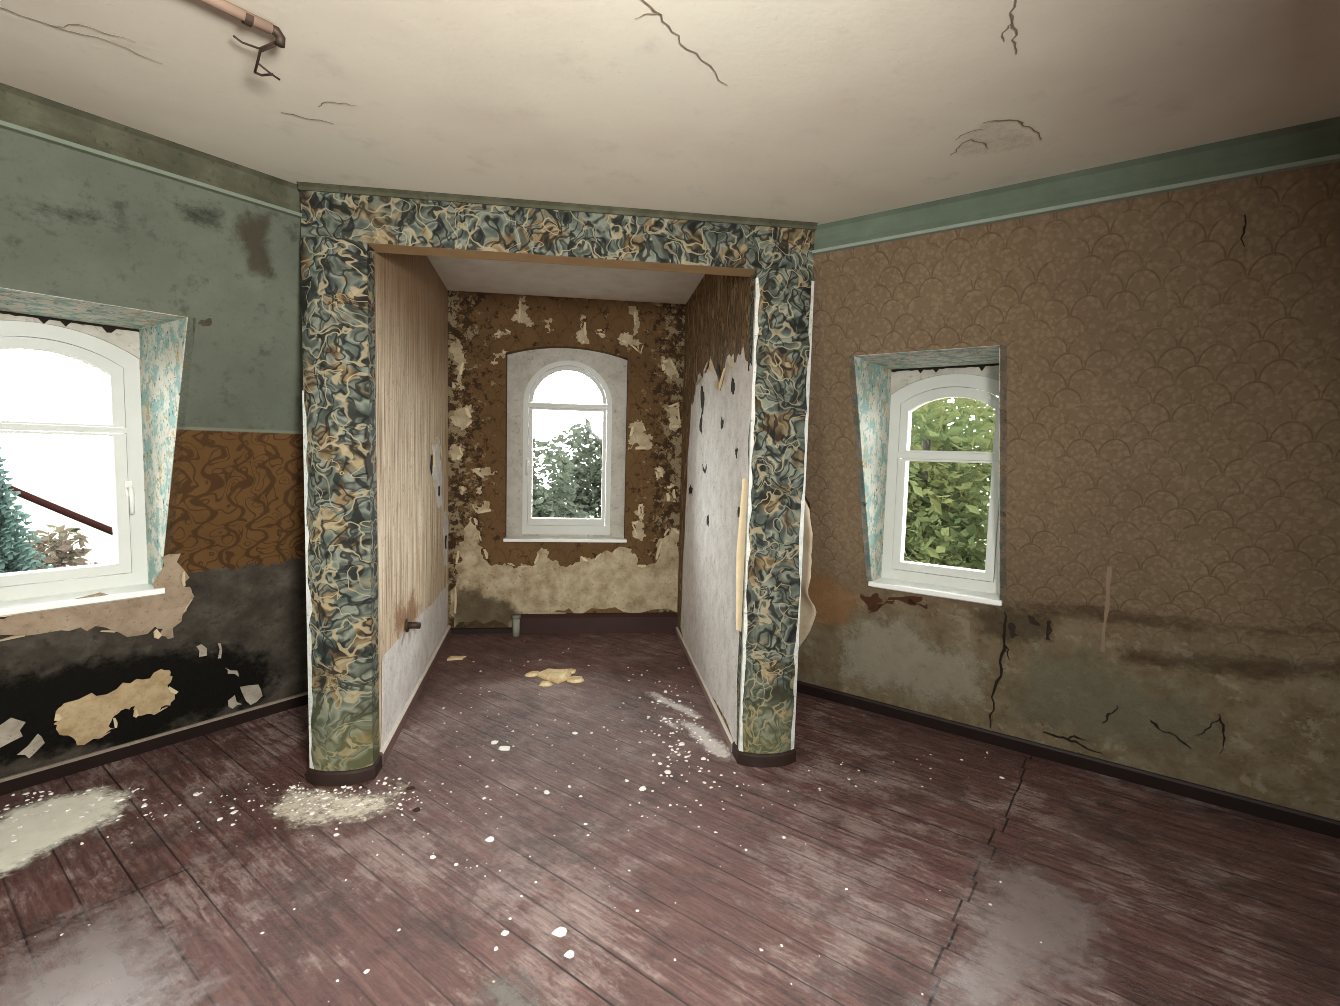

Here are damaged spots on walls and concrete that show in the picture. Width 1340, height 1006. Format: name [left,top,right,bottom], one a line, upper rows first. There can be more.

flaking render [0,553,194,641]
spalling [0,718,45,758]
spalling [54,669,178,745]
spalling [228,685,262,709]